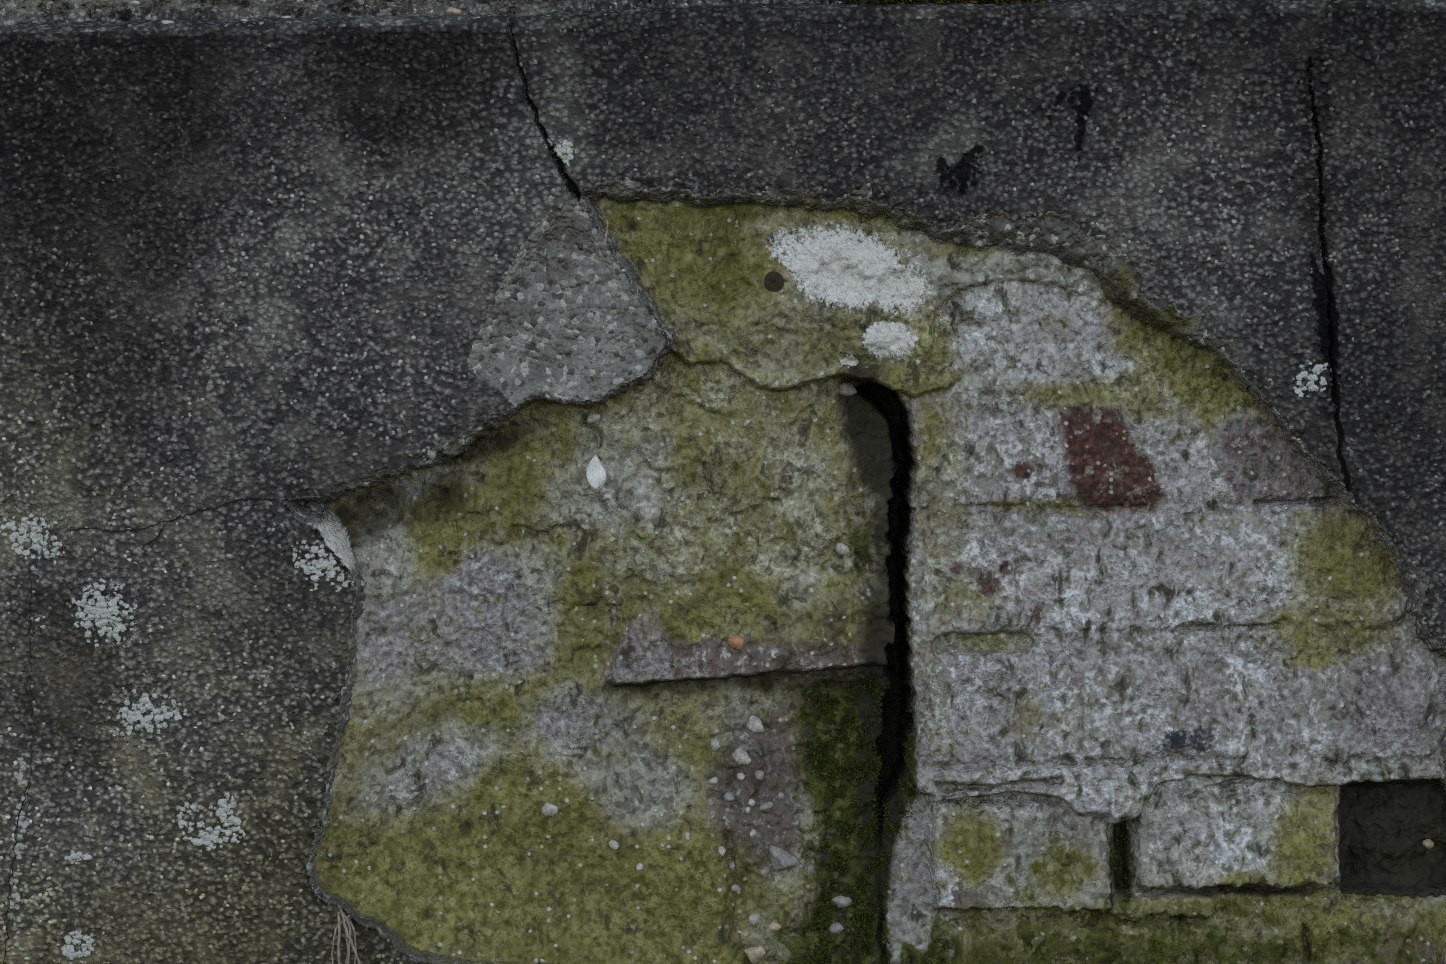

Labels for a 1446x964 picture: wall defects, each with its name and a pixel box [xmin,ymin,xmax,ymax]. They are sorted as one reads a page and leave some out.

crack [511,21,581,198]
crack [1307,57,1352,492]
spalling [288,177,1446,964]